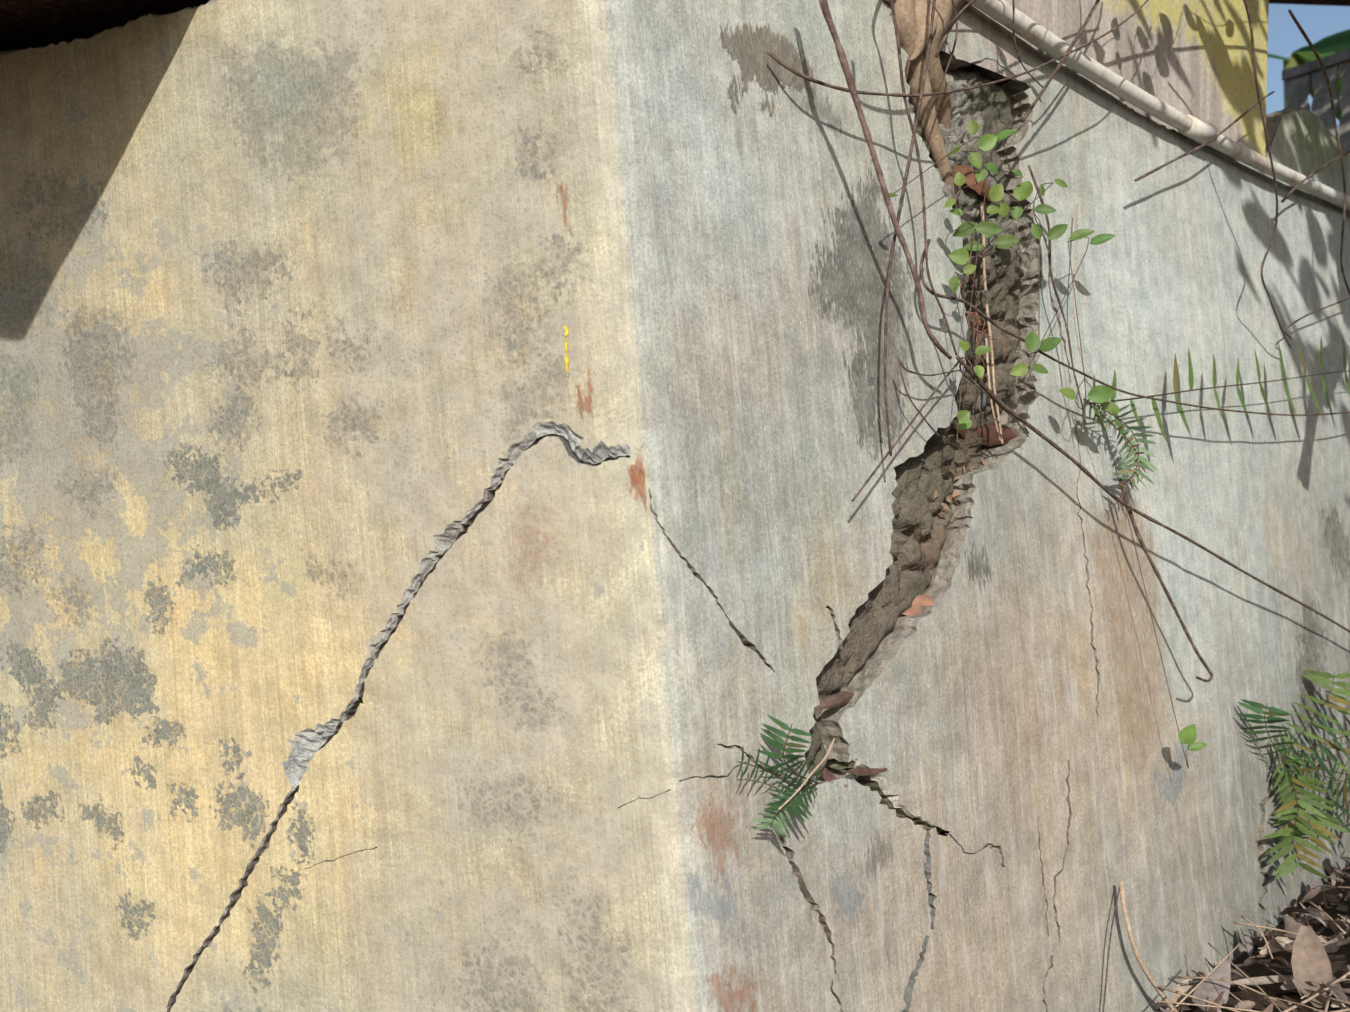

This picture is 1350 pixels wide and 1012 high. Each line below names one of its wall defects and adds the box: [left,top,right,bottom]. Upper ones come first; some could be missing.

crack [167,421,630,1012]
corrosion [629,459,648,508]
crack [619,42,1100,1012]
damp [808,159,914,462]